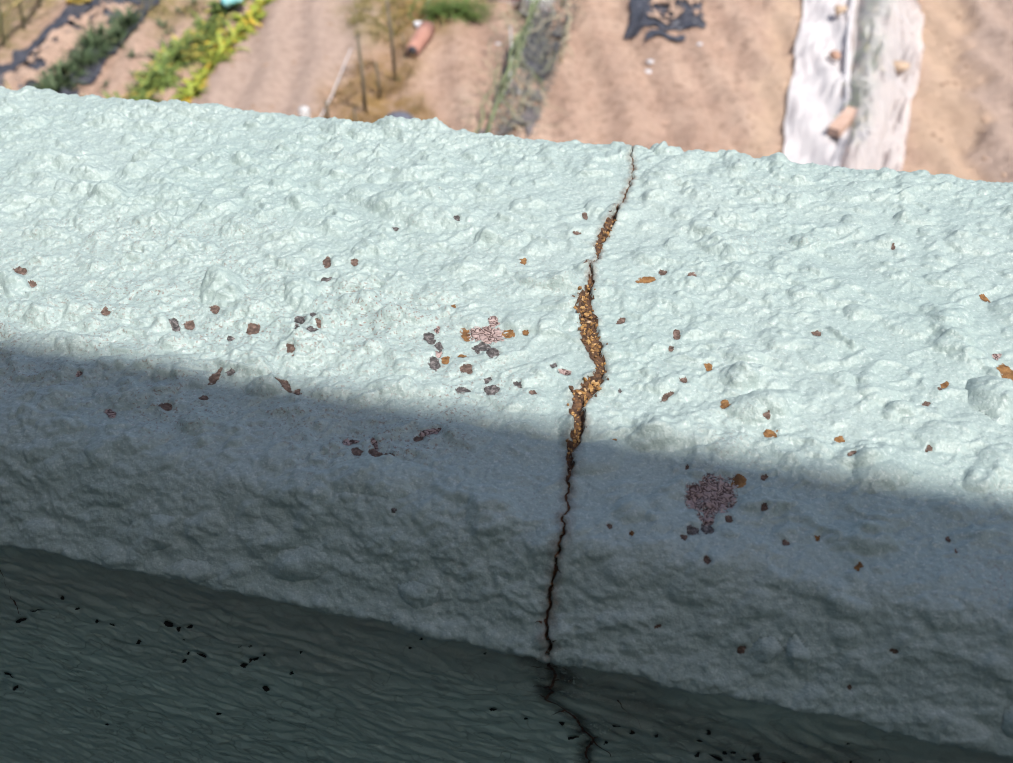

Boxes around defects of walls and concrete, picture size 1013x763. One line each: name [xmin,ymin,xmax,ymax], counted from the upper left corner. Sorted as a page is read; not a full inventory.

spalling [422,315,529,374]
peeling [455,376,500,396]
peeling [549,362,572,375]
crack [532,150,634,763]
spalling [680,472,747,541]